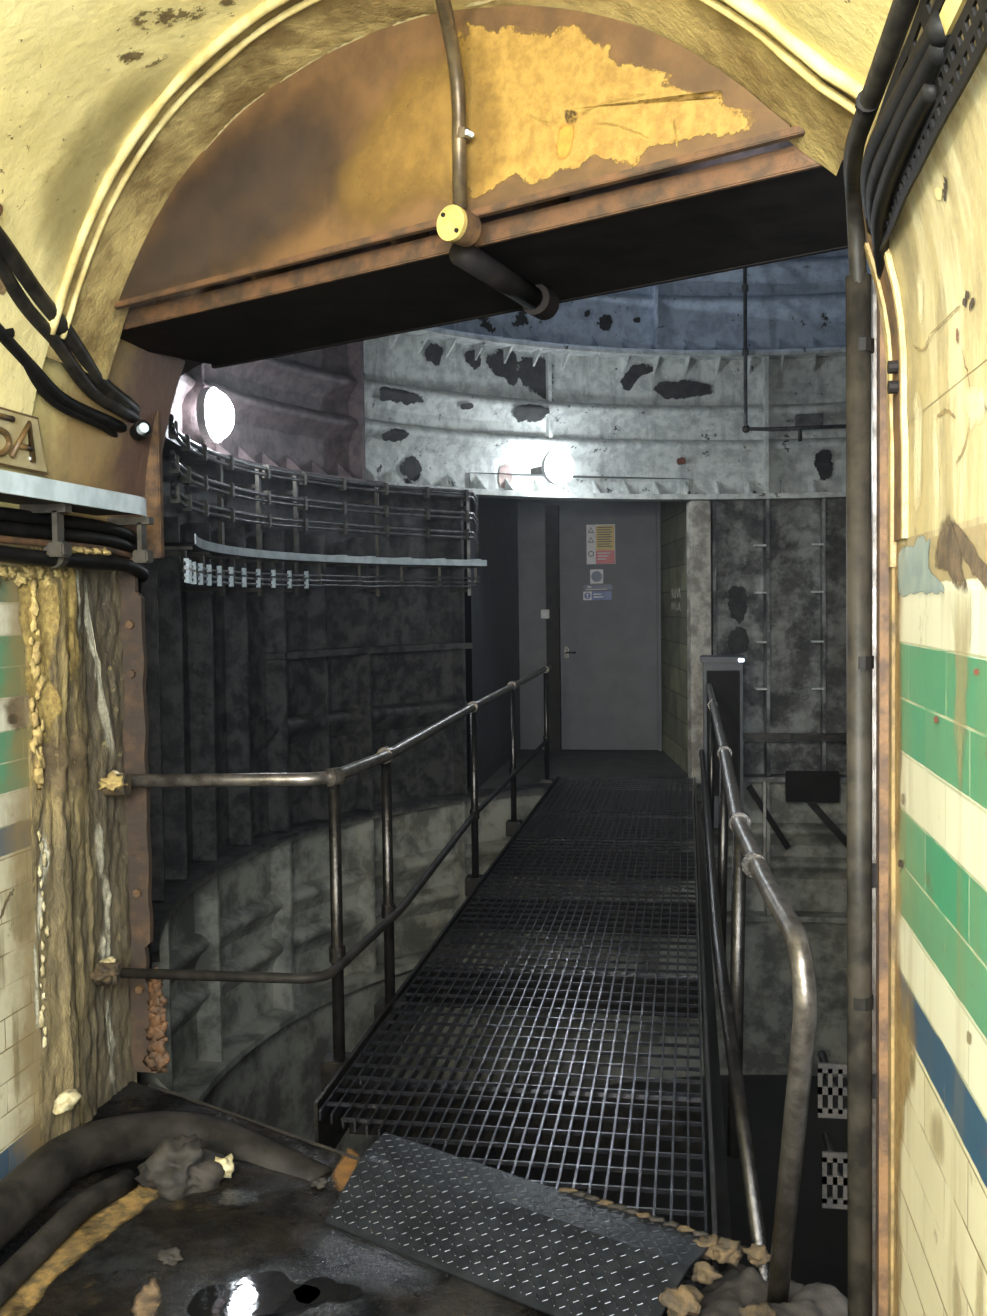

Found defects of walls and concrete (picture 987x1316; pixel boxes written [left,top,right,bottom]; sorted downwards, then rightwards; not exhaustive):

peeling [347,0,754,216]
peeling [379,386,424,406]
peeling [425,343,443,366]
peeling [464,317,554,423]
peeling [620,363,712,399]
peeling [382,428,409,442]
peeling [399,455,422,482]
peeling [814,449,833,480]
peeling [897,535,944,597]
crack [0,888,15,919]
spalling [37,831,50,1049]
rust [142,966,170,1074]